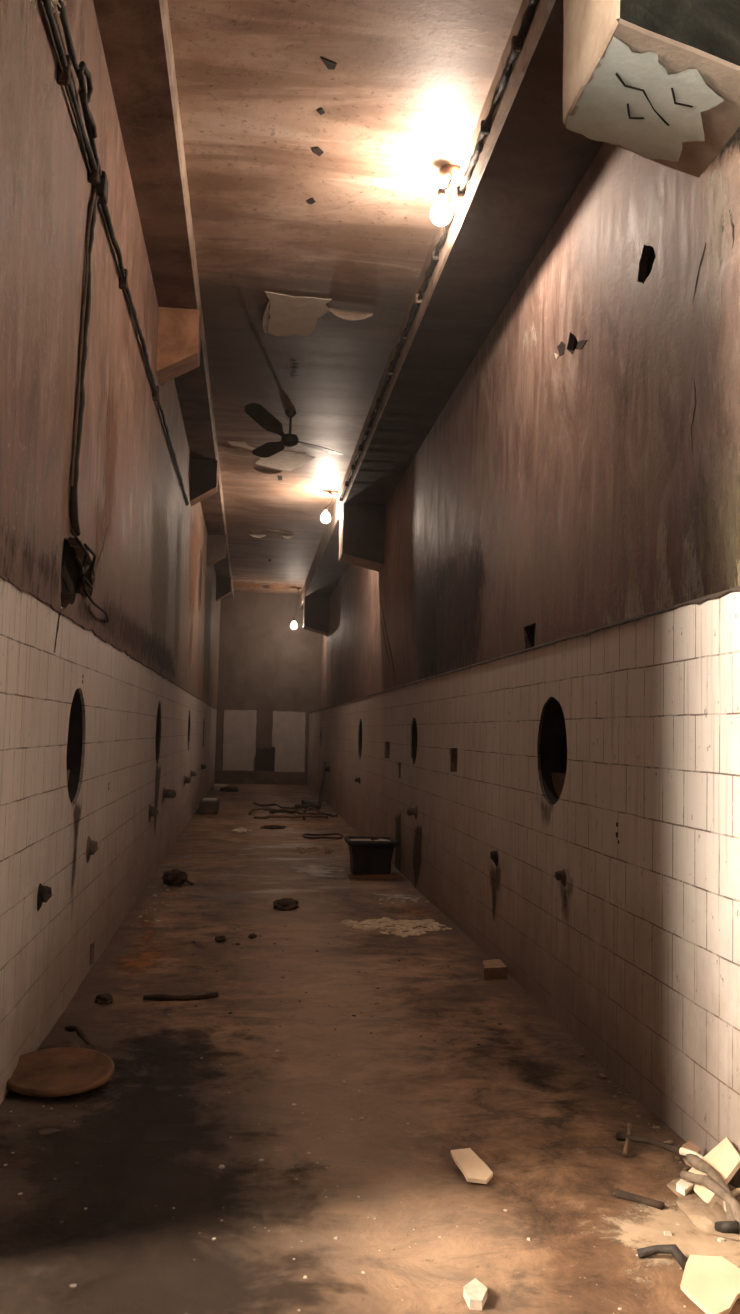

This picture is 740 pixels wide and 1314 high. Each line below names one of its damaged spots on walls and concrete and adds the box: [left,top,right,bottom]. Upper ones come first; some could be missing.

peeling [566,36,724,162]
peeling [263,291,373,337]